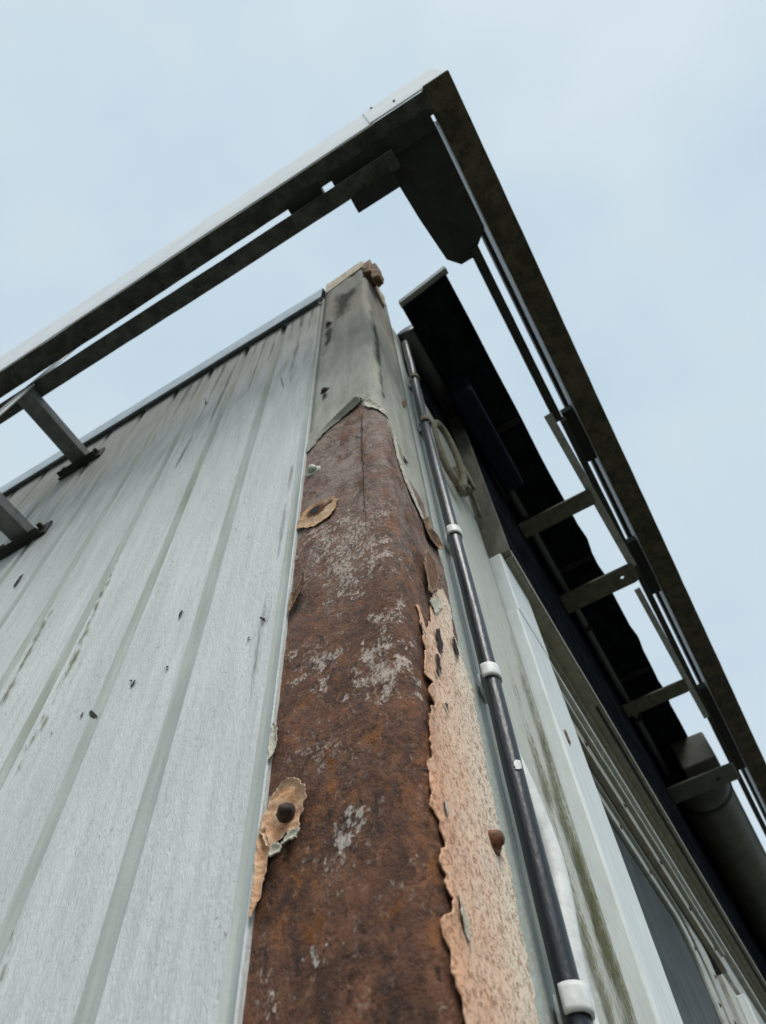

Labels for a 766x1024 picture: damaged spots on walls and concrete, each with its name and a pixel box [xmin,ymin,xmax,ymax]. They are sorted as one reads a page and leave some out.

peeling [296,496,339,529]
rust [242,404,465,1024]
peeling [306,396,541,1024]